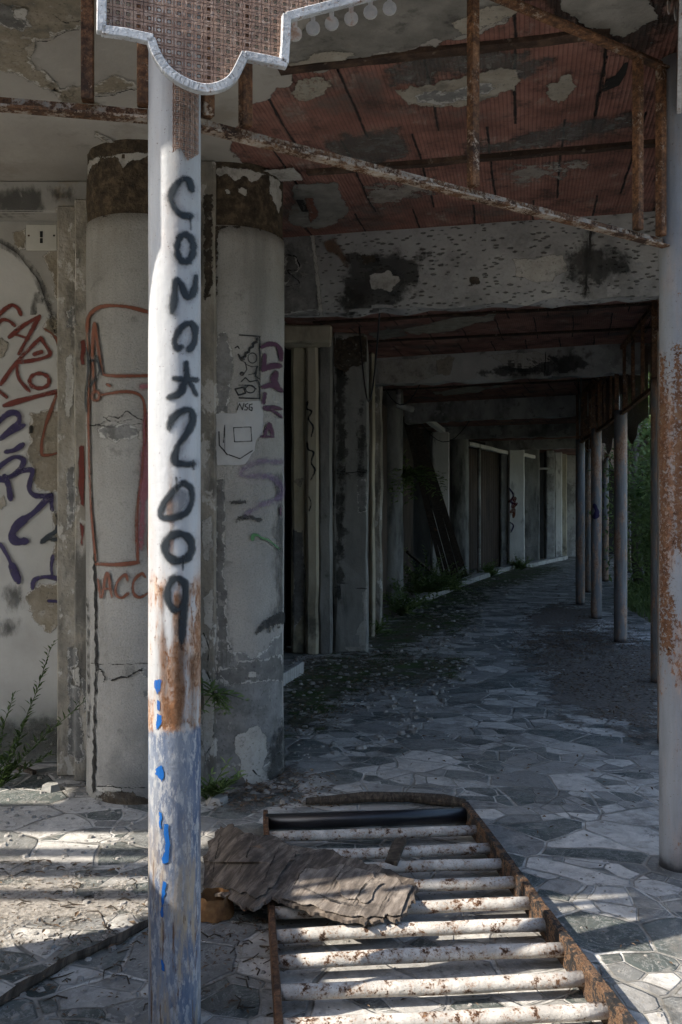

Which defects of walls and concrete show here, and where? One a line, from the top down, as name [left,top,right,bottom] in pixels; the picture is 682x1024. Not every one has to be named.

peeling [0,0,137,105]
peeling [87,131,148,179]
peeling [203,194,240,303]
leakage [337,248,428,316]
leakage [568,245,630,296]
peeling [216,331,234,414]
corrosion [659,342,682,661]
crack [86,553,148,792]
corrosion [160,587,195,725]
peeling [201,474,306,784]